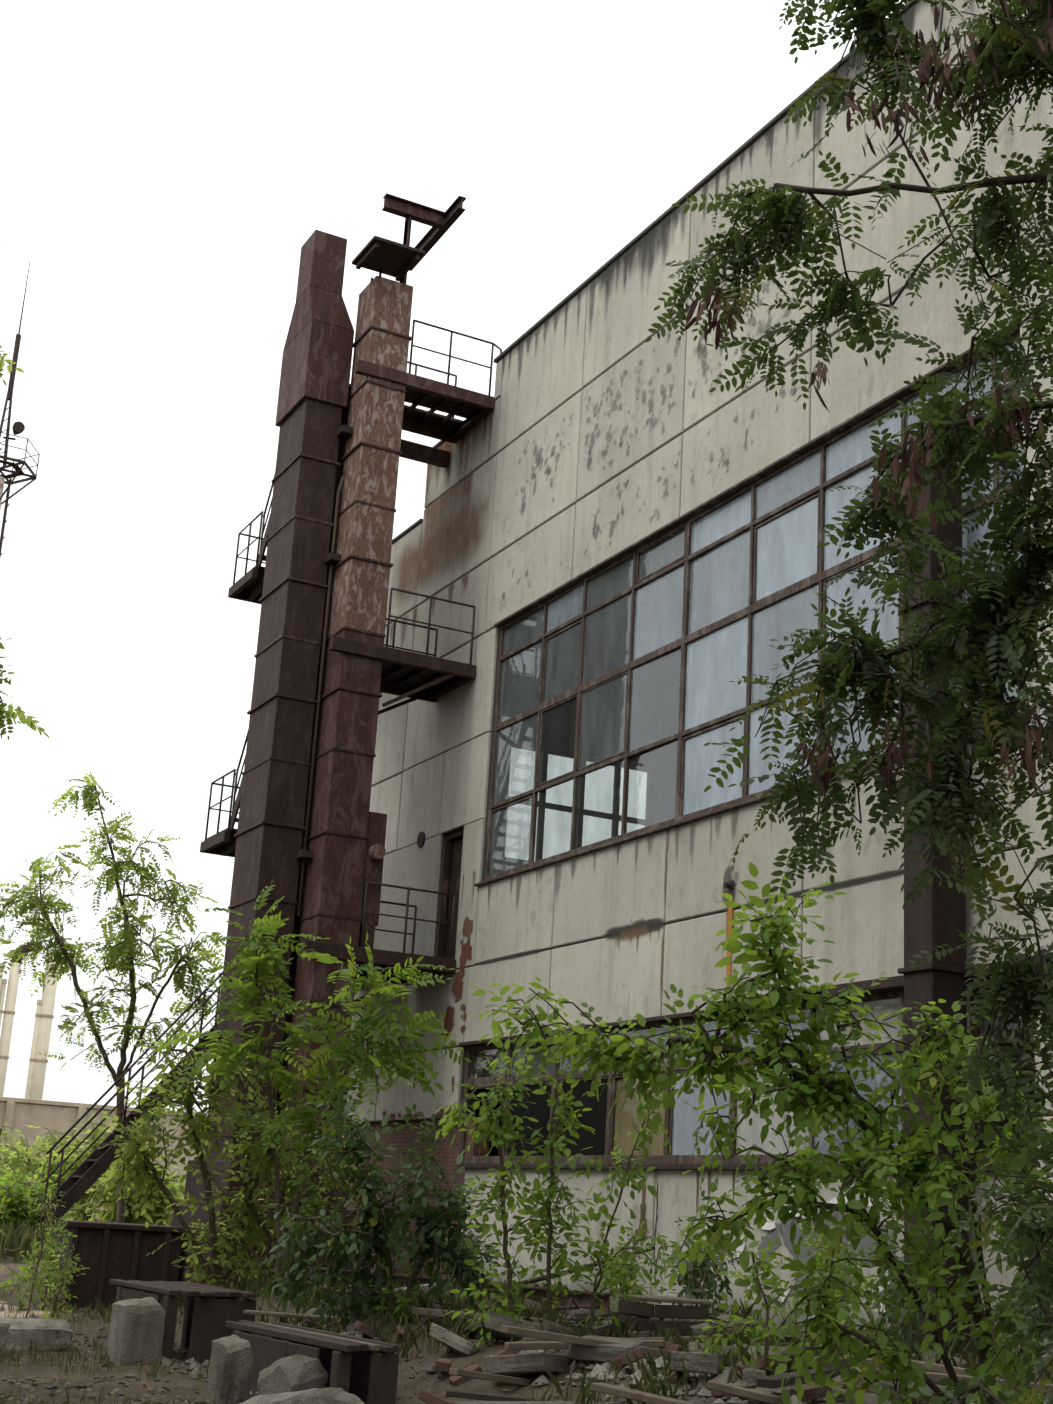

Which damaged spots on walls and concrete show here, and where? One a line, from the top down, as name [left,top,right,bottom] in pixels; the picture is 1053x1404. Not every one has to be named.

water stain [880,0,942,38]
water stain [503,51,878,370]
rust [399,410,493,594]
spalling [763,870,904,904]
spalling [441,940,539,1036]